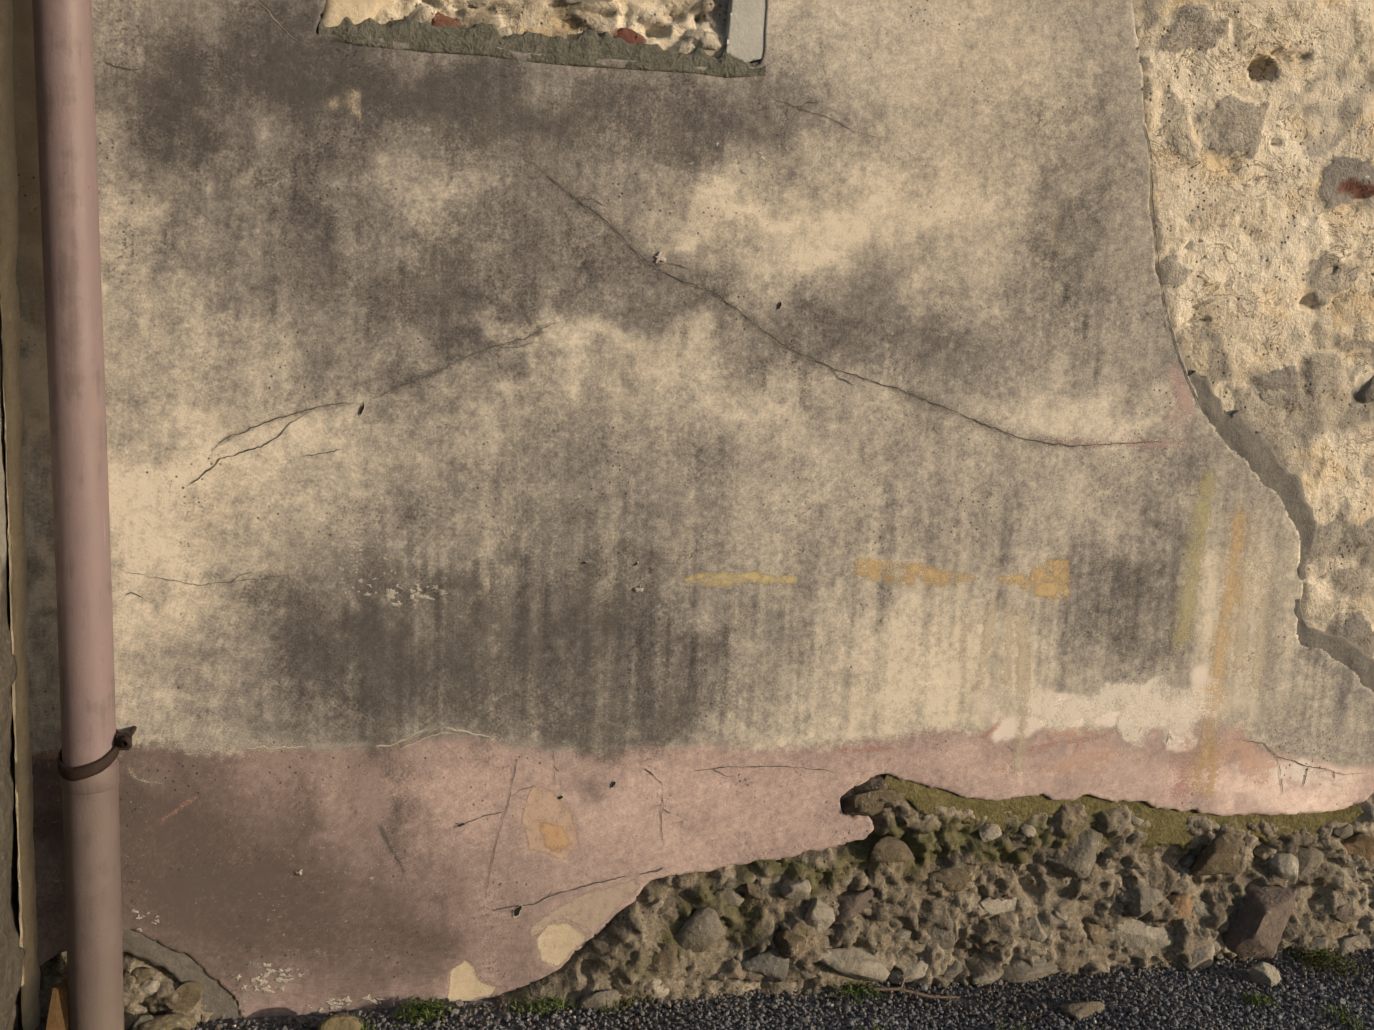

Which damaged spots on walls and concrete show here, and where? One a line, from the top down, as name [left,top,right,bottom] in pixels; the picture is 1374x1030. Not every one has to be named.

spalling [316,0,766,78]
crack [512,125,1211,447]
crack [188,321,563,486]
crack [456,751,670,912]
crack [696,766,836,777]
peeling [986,673,1219,749]
spalling [447,774,1374,1015]
spalling [35,951,68,1030]
spalling [122,909,305,1030]